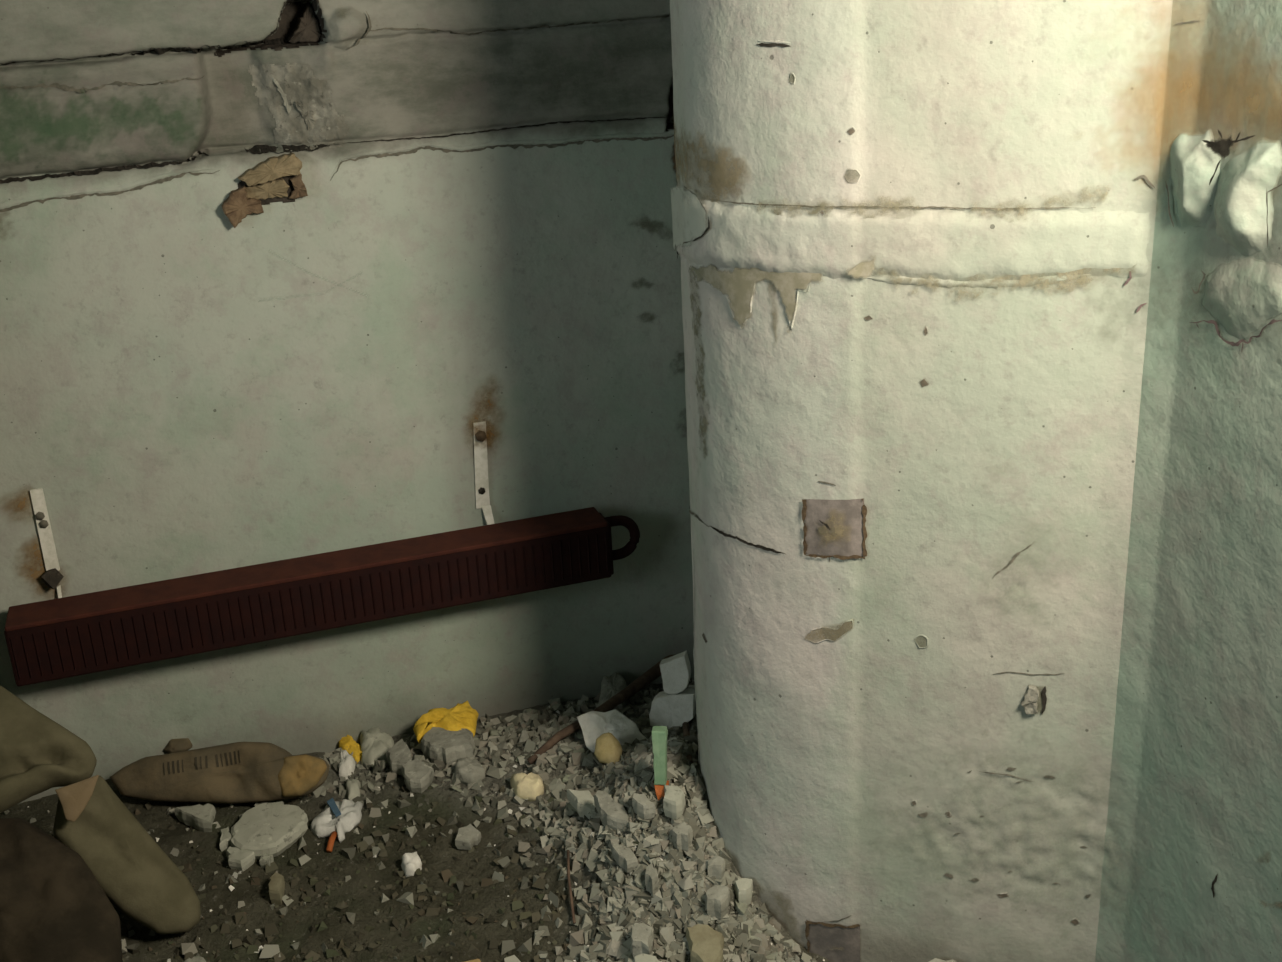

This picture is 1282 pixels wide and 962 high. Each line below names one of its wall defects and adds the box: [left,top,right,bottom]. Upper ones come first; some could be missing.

crack [364,16,668,36]
crack [0,36,327,93]
spalling [214,0,675,228]
crack [244,112,673,154]
crack [0,152,209,184]
peeling [692,264,822,332]
crack [689,507,785,554]
rust [23,542,56,591]